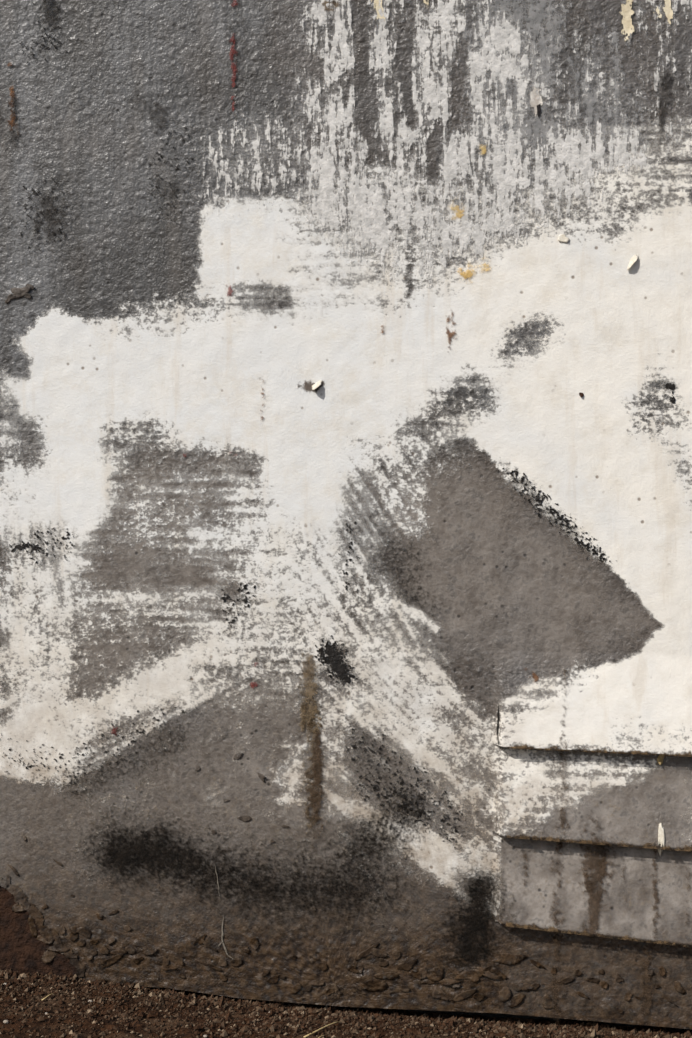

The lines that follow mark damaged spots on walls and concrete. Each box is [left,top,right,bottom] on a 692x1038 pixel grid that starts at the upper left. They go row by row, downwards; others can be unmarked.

damp [297,653,324,828]
peeling [0,864,185,979]